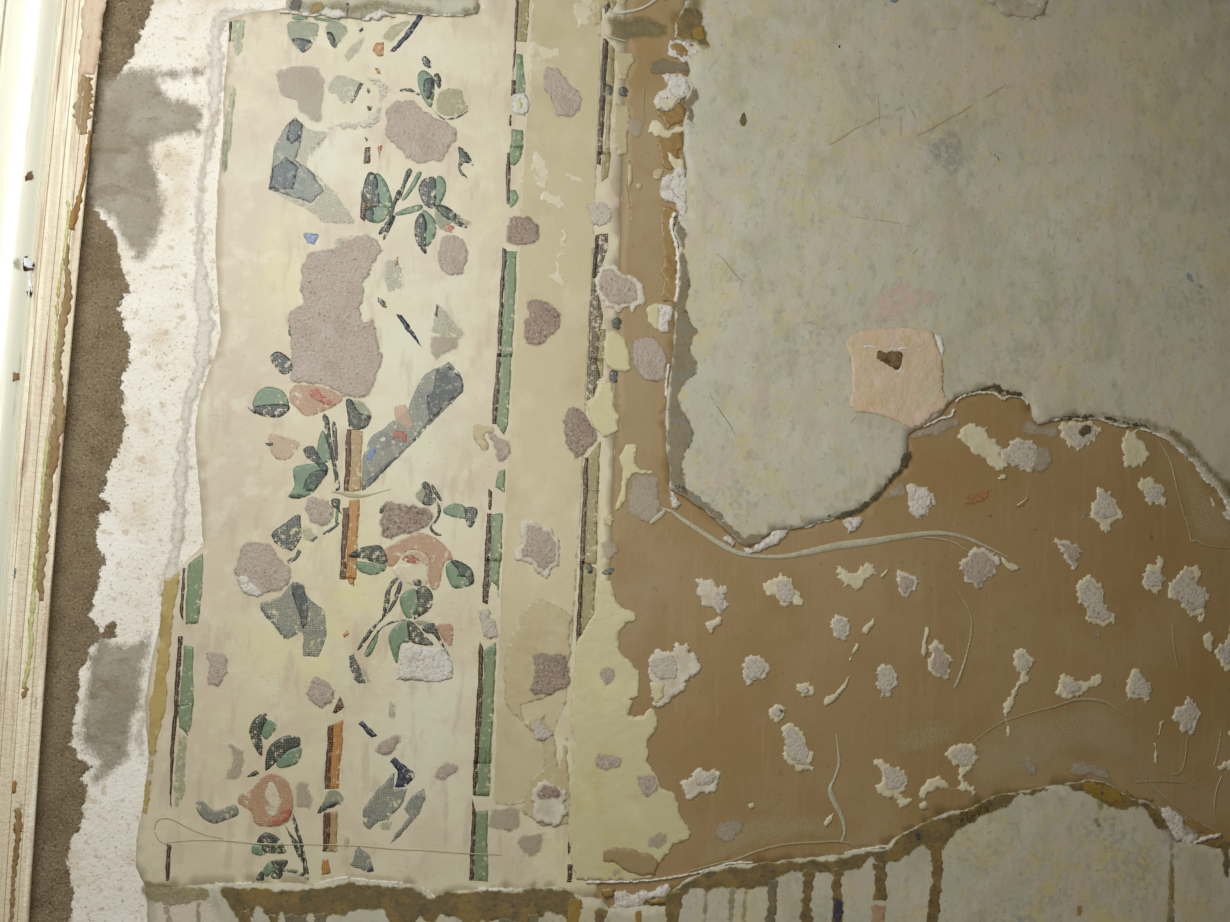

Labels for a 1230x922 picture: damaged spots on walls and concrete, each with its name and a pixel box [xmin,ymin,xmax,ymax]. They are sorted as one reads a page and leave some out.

peeling [77,0,106,83]
spalling [275,65,457,164]
spalling [288,234,383,398]
spalling [562,263,673,459]
damp [29,0,154,922]
peeling [957,423,1053,480]
spalling [379,501,433,539]
spalling [1142,555,1230,672]
peeling [478,581,721,881]
spalling [873,743,980,810]
damp [141,880,608,922]
damp [665,778,1175,922]